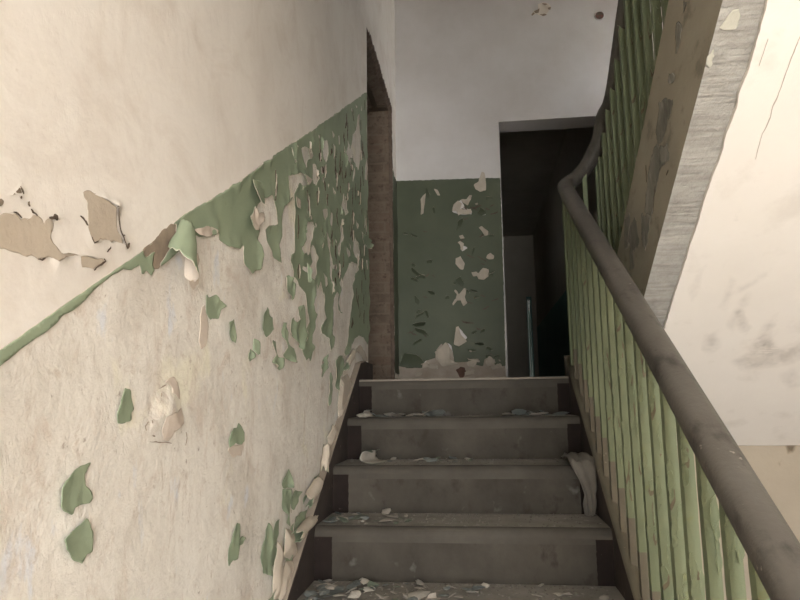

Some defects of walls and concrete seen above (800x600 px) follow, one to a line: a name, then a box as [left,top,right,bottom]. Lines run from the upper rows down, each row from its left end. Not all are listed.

peeling [0,92,374,600]
peeling [367,32,507,379]